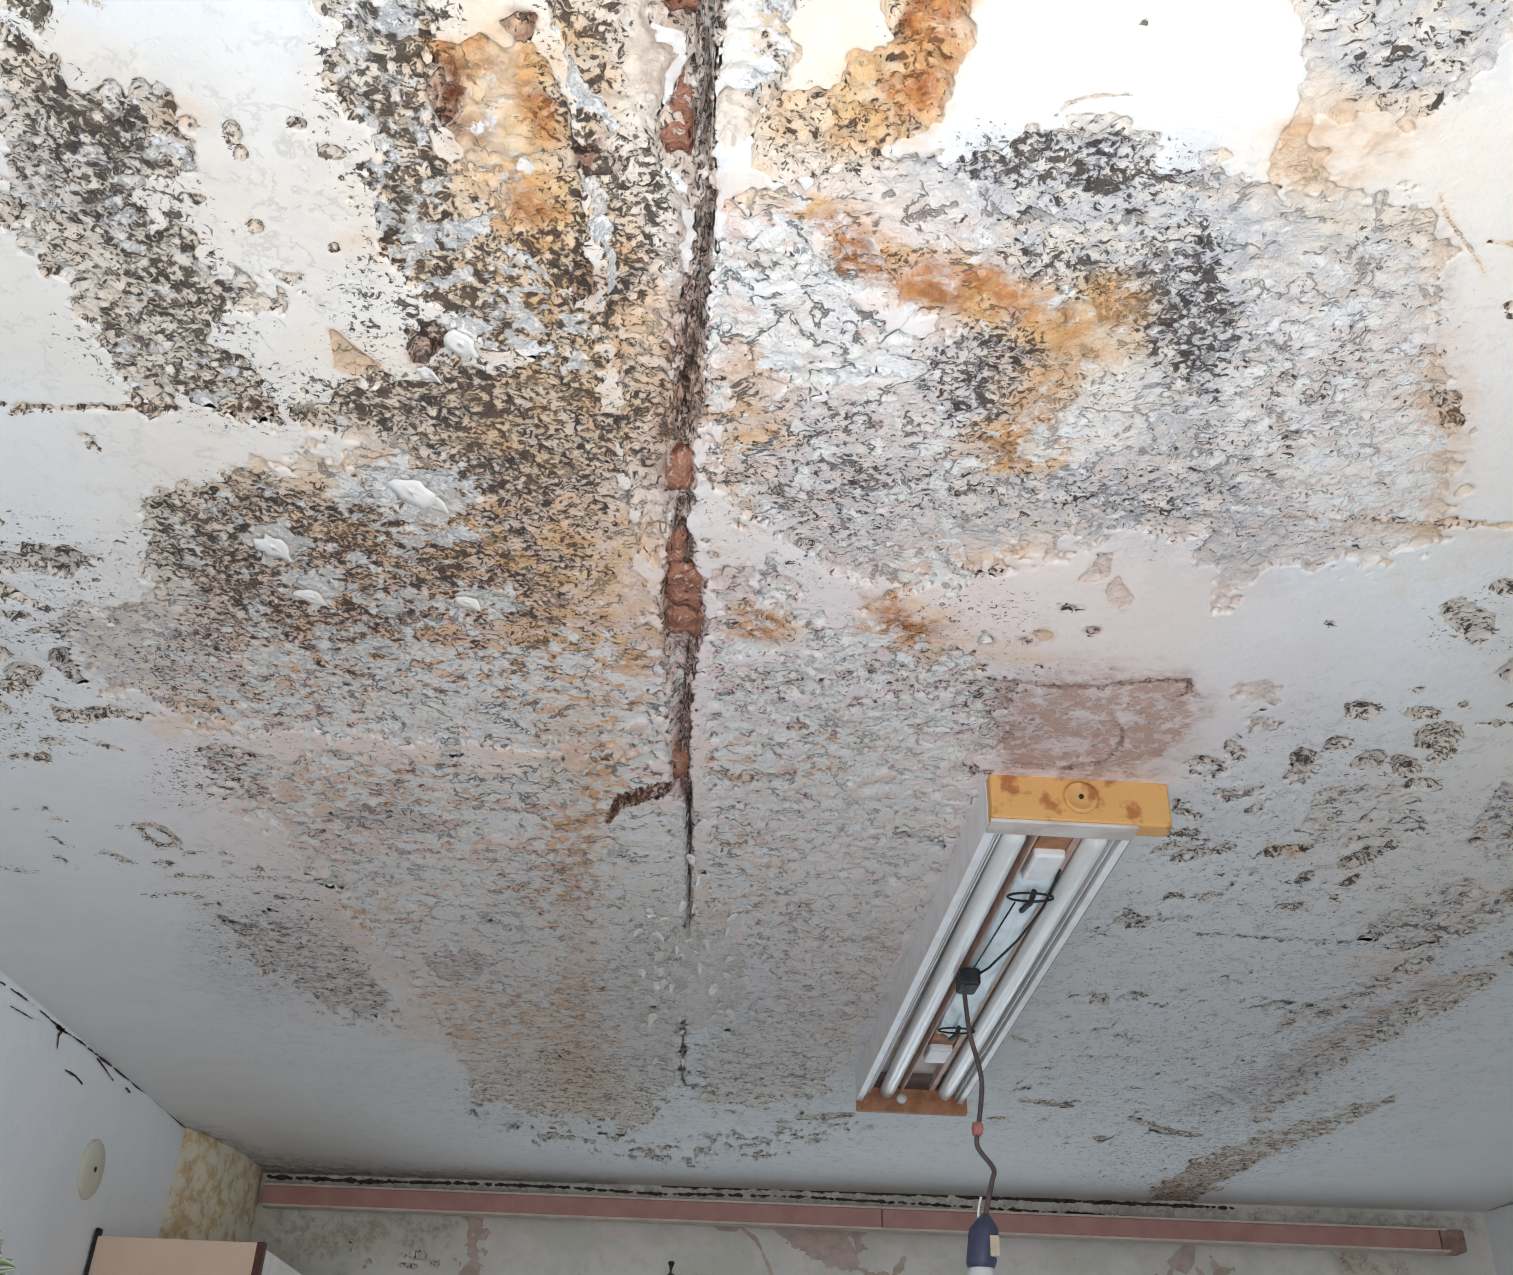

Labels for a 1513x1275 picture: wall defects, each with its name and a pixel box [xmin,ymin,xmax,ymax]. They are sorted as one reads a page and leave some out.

flaking render [699,0,1513,613]
crack [1486,239,1513,248]
flaking render [0,0,1193,1168]
crack [602,0,794,935]
crack [1284,512,1513,530]
flaking render [1438,578,1513,646]
water stain [1003,682,1191,776]
flaking render [1073,680,1470,947]
peeling [1467,782,1513,859]
water stain [210,902,404,1028]
crack [0,981,186,1128]
peeling [1008,878,1513,1203]